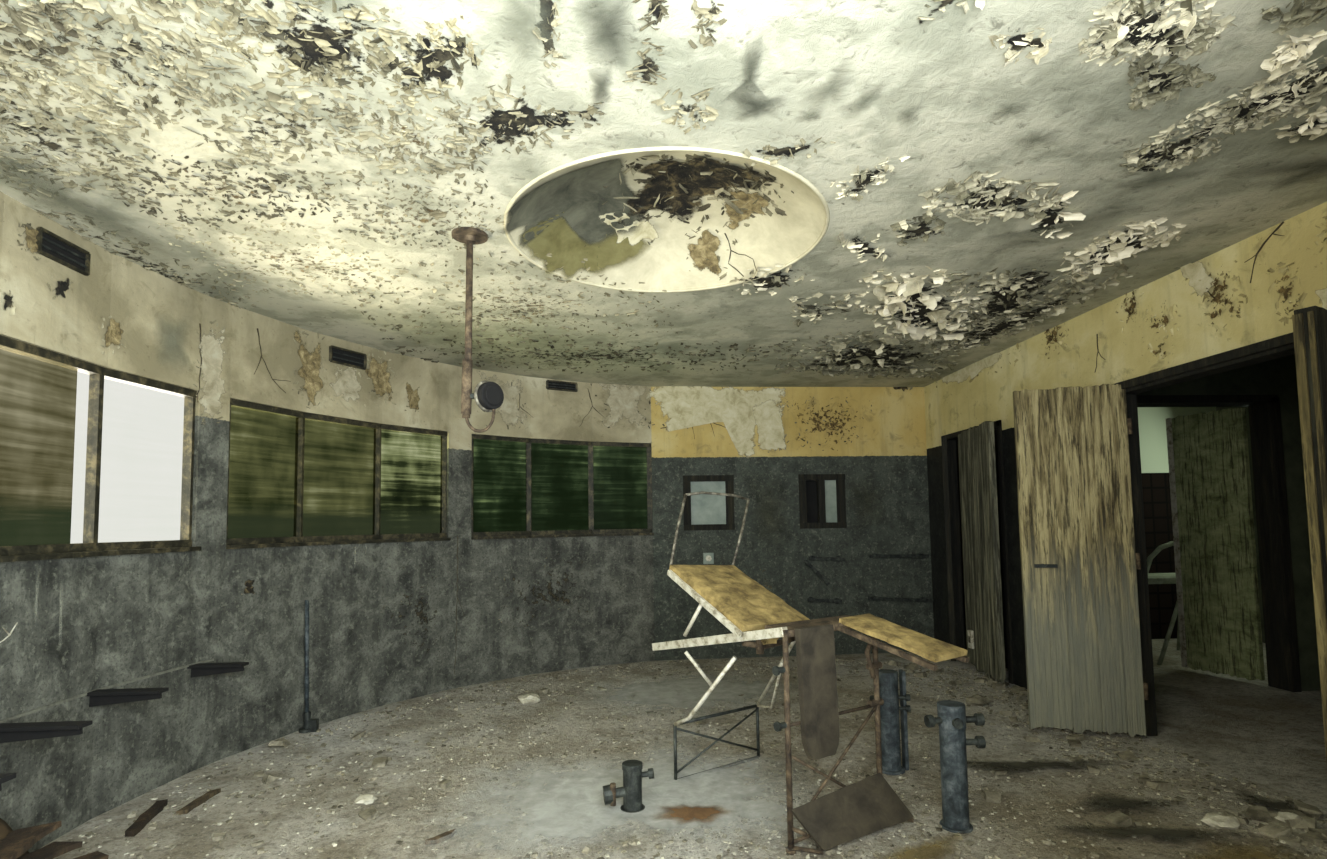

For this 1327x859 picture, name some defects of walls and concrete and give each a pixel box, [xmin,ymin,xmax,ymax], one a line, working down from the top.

peeling [1077,0,1237,111]
peeling [1119,0,1327,174]
peeling [0,0,1187,457]